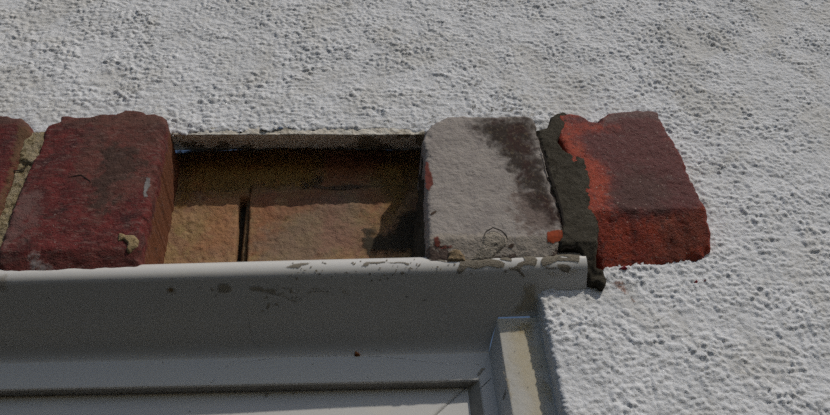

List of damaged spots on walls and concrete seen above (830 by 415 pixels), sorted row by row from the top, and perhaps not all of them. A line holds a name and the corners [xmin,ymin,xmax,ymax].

leakage [177,131,425,281]
leakage [474,117,561,221]
leakage [430,244,580,277]